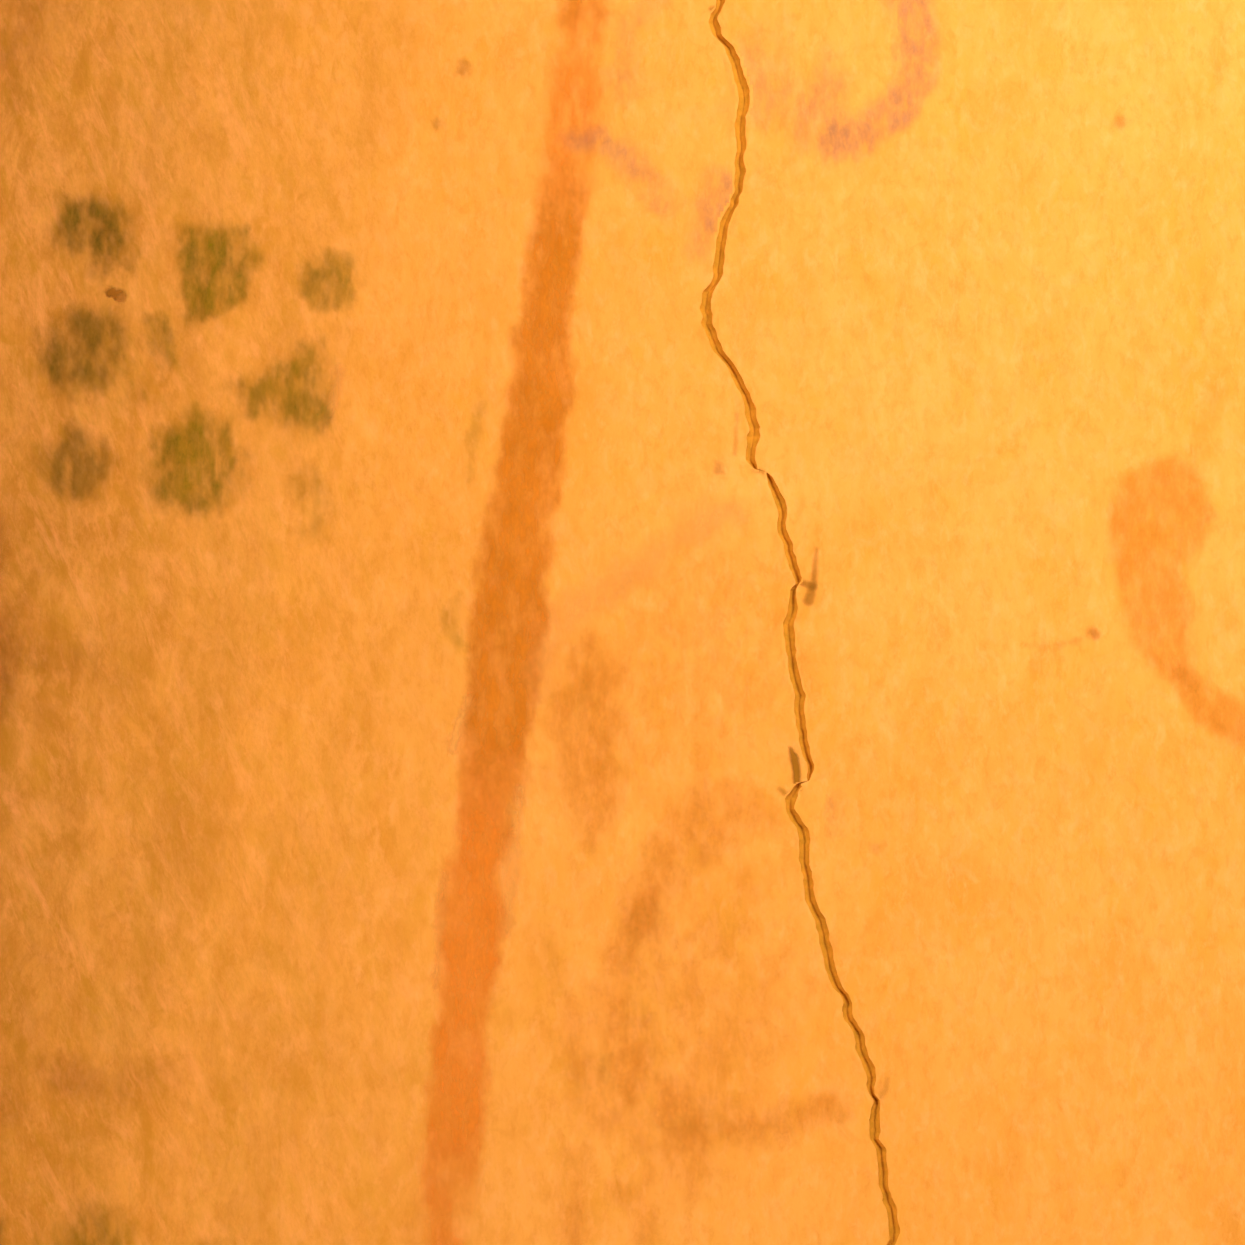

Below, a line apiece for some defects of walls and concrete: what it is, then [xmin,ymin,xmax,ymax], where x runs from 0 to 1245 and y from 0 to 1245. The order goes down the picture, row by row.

crack [700,0,900,1245]